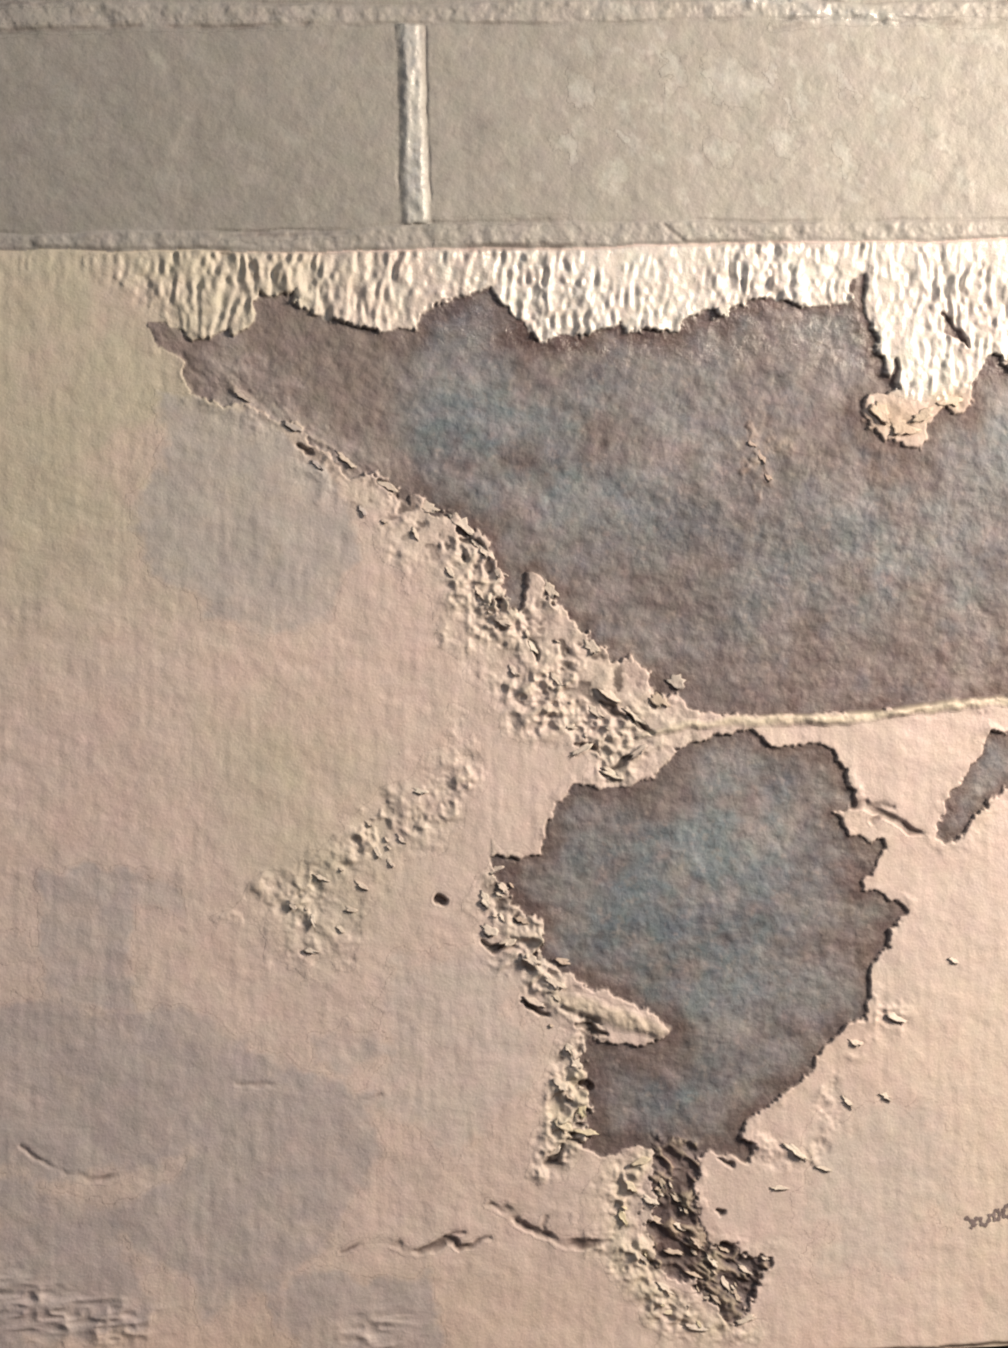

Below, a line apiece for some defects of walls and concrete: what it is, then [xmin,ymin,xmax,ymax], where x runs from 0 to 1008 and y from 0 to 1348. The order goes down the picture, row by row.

crack [337,1198,615,1259]
spalling [83,240,1008,1348]